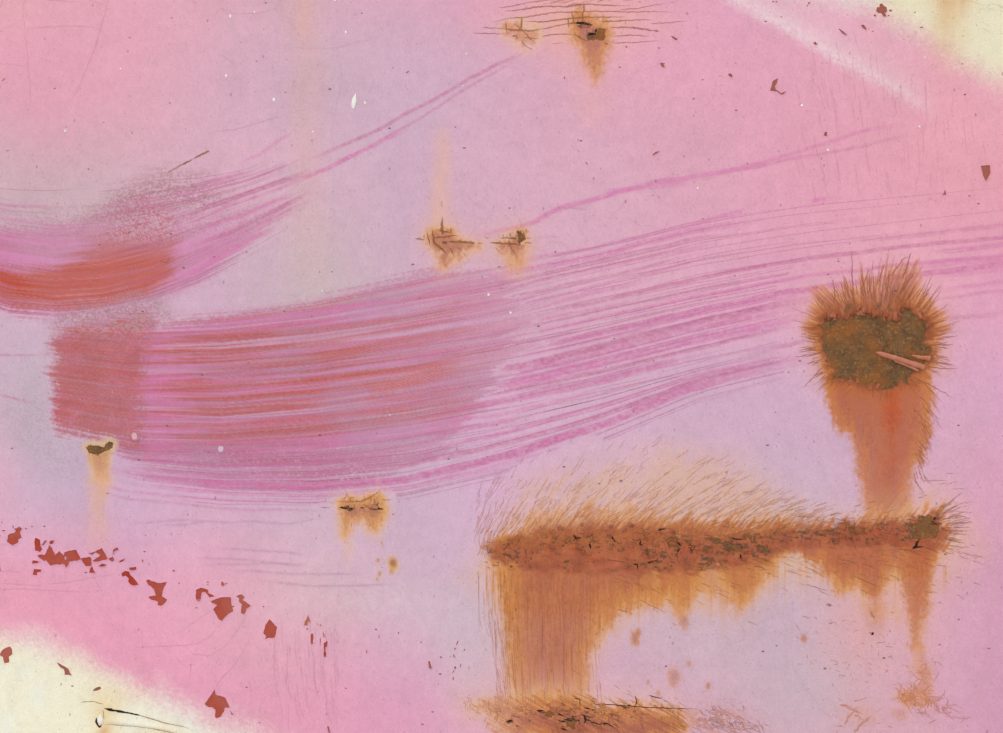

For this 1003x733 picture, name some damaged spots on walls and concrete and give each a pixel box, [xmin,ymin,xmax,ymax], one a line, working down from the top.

corrosion [459,0,725,94]
corrosion [402,201,551,292]
peeling [0,521,181,608]
corrosion [76,434,123,557]
corrosion [322,480,402,584]
corrosion [433,236,1002,733]
peeling [0,645,13,664]
peeling [56,661,73,676]
peeling [203,688,233,720]
peeling [195,581,279,640]
peeling [303,615,339,658]